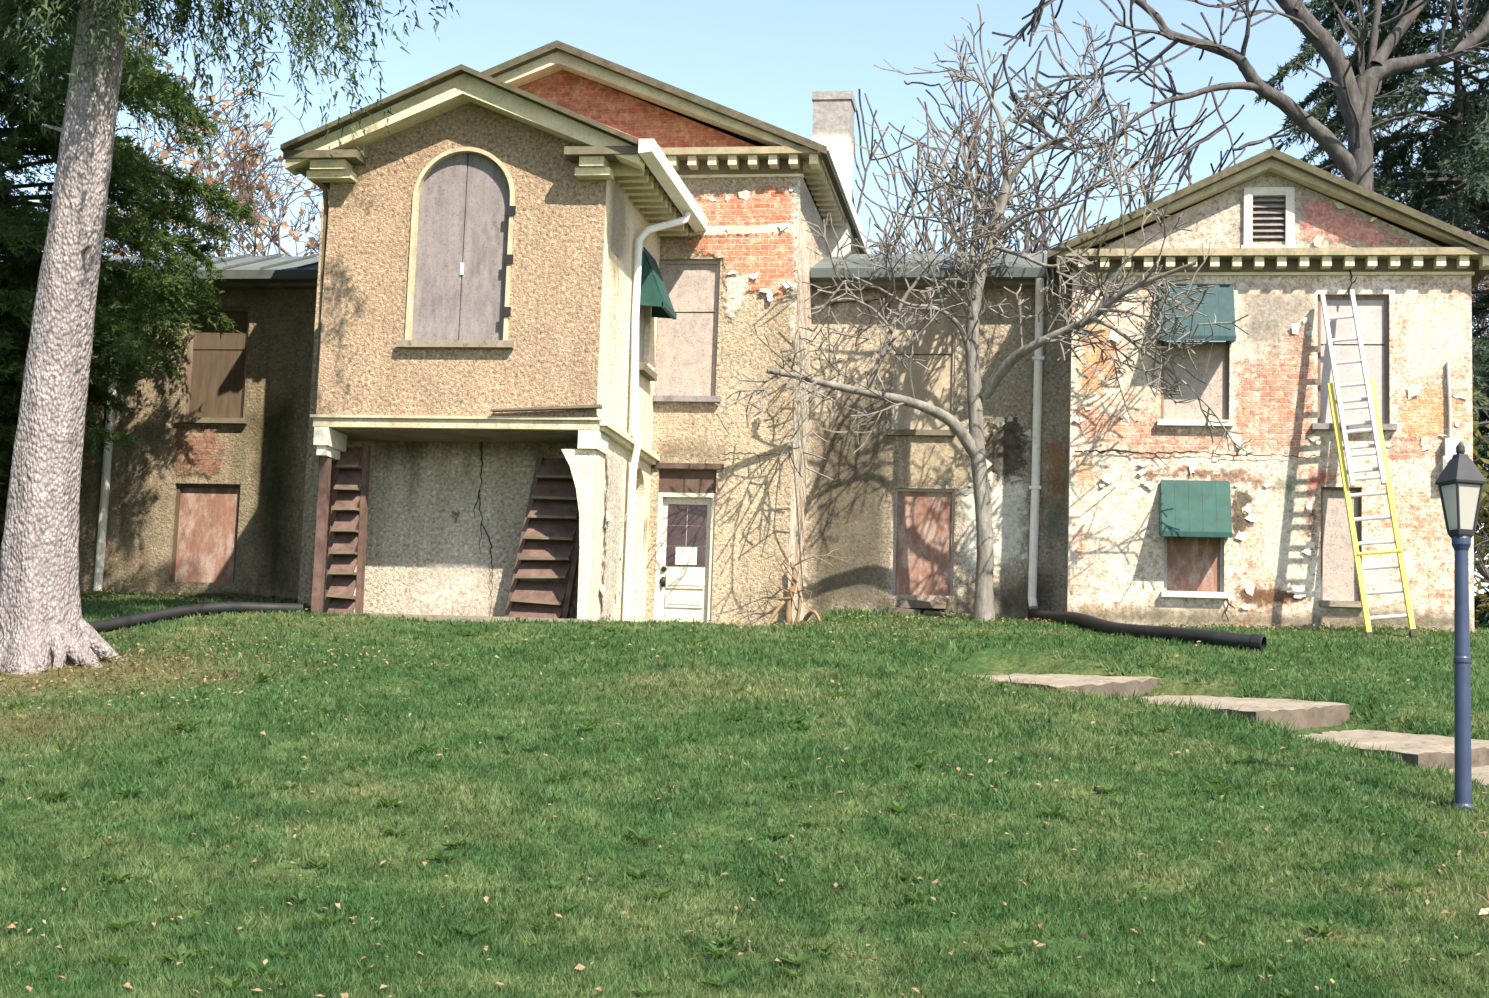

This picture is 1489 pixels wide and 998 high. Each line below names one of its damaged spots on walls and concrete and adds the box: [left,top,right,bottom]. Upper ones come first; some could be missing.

flaking render [683,183,799,321]
crack [473,442,494,616]
peeling [960,416,1032,573]
flaking render [1071,313,1320,540]
flaking render [1385,384,1467,462]